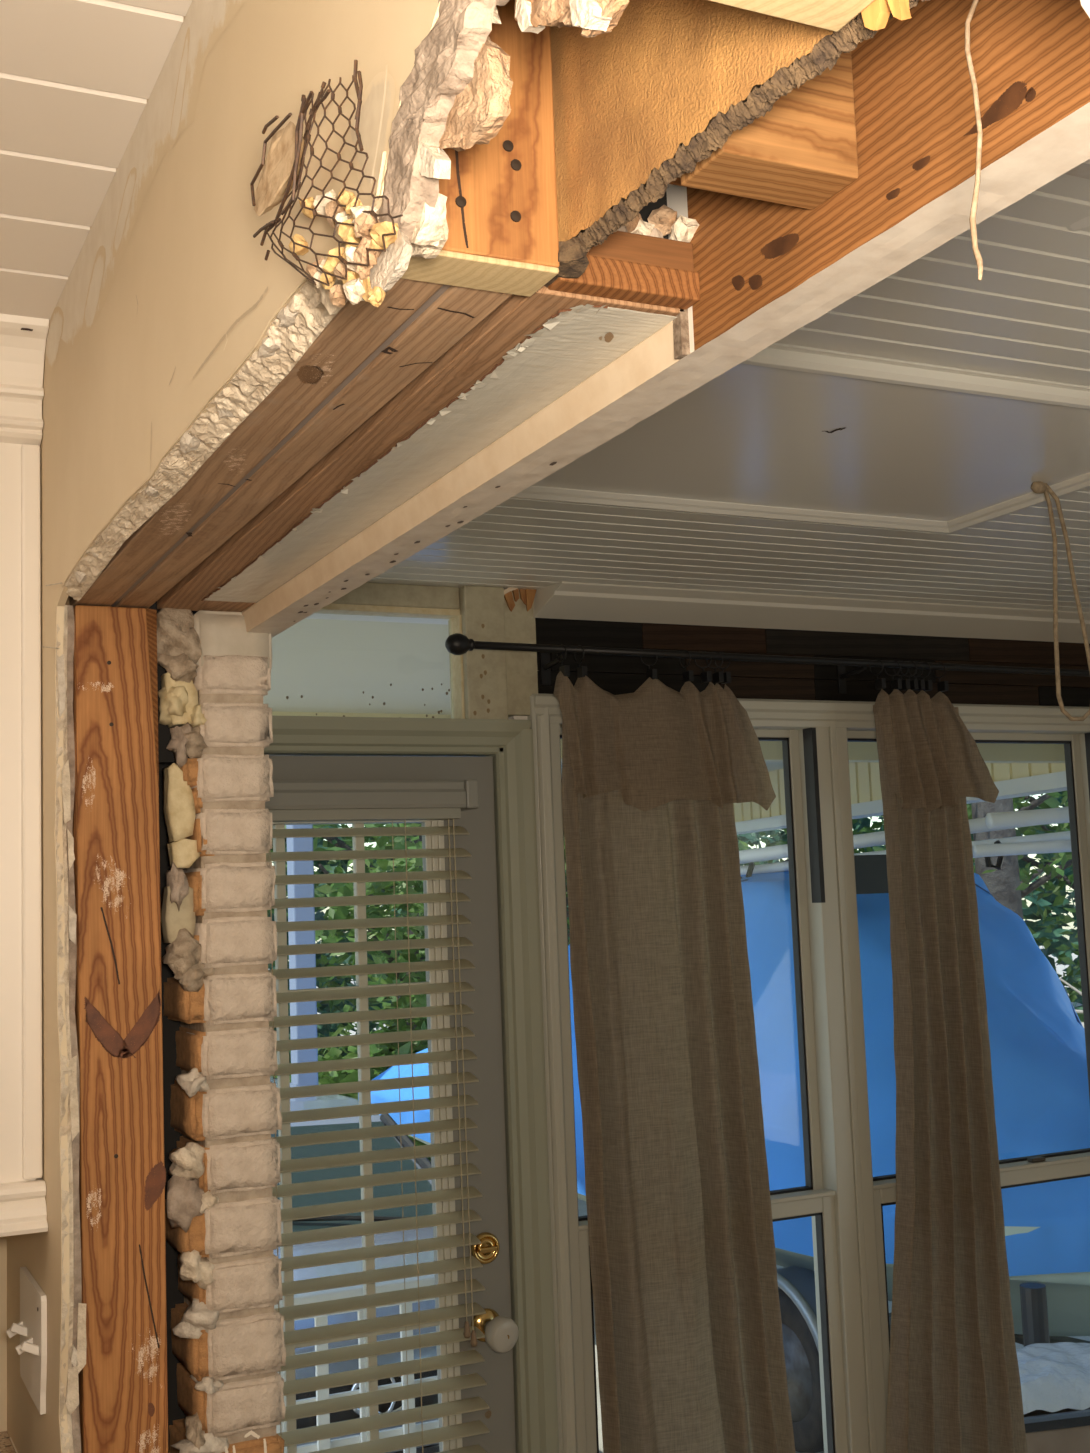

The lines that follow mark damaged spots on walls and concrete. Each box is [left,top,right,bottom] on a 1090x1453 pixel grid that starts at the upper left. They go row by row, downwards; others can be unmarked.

flaking render [370,0,630,259]
peeling [201,304,608,601]
flaking render [41,275,348,1453]